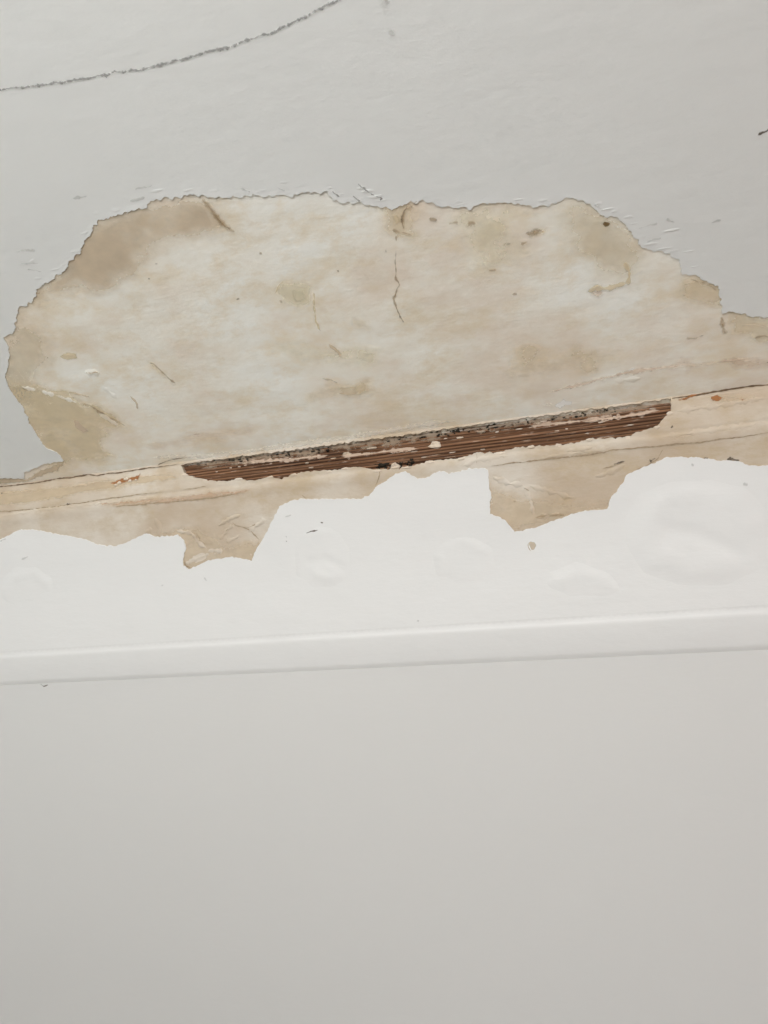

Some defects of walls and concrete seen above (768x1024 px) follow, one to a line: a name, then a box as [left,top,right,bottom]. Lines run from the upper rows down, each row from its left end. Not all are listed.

crack [0,0,339,91]
water stain [54,202,225,288]
peeling [0,181,768,566]
water stain [0,351,173,503]
mould [374,459,415,469]
water stain [385,419,536,442]